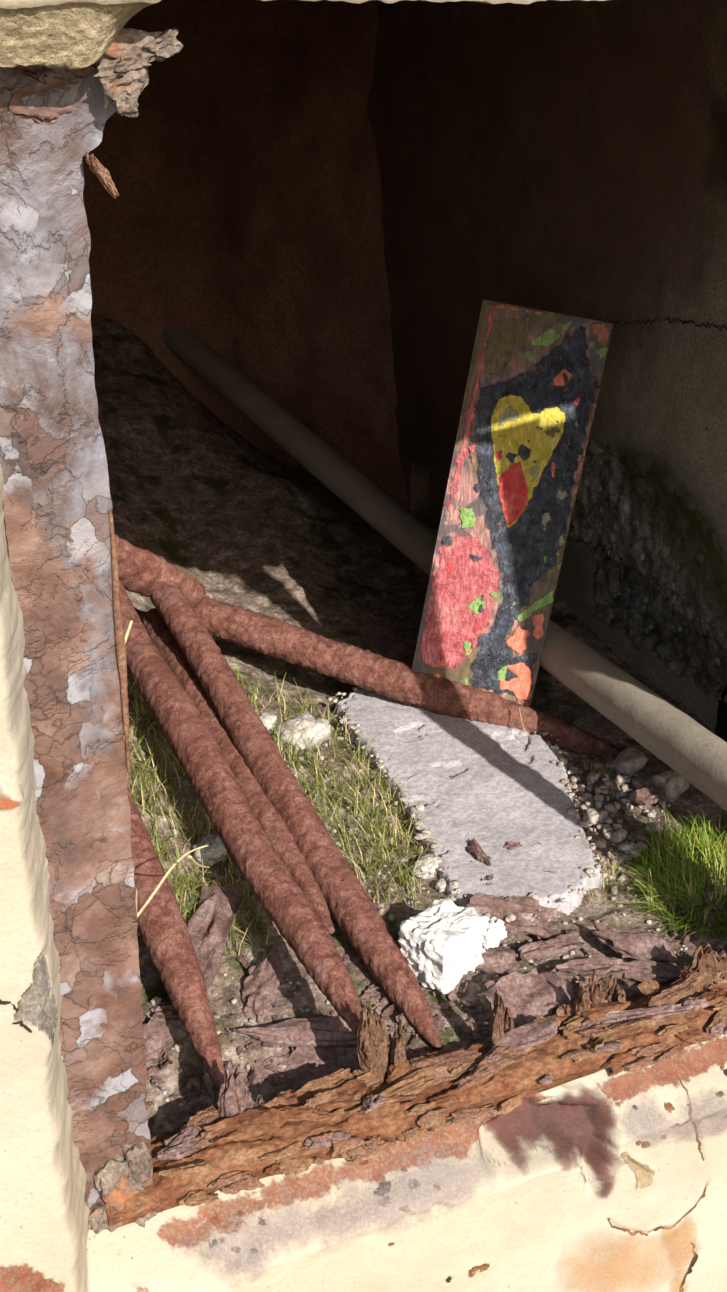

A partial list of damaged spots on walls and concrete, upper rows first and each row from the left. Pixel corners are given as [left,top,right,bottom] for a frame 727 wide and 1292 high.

crack [595,316,727,332]
spalling [567,436,727,743]
rust [598,1037,727,1107]
crack [609,1079,707,1292]
rust [0,1264,65,1292]